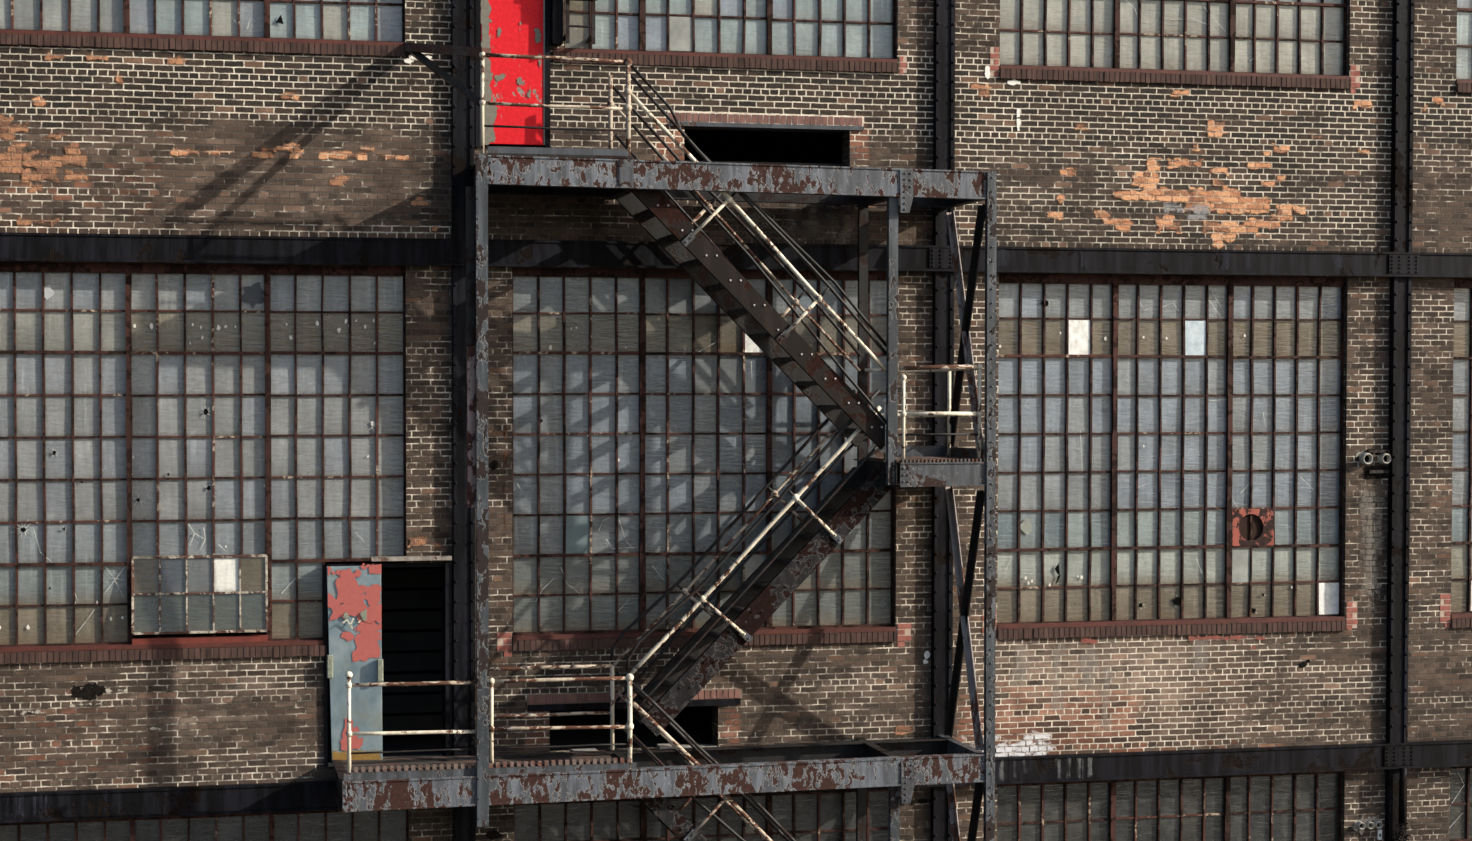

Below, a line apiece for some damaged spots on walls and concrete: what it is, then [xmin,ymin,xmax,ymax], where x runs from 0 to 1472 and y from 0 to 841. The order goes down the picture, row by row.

peeling [520,22,542,68]
peeling [481,0,531,145]
spalling [32,96,47,106]
spalling [0,113,88,193]
spalling [170,148,233,156]
spalling [251,143,409,186]
spalling [1047,194,1065,220]
spalling [1060,168,1076,177]
spalling [1094,120,1306,249]
peeling [328,563,382,662]
peeling [340,718,363,751]
damp [962,732,1092,778]